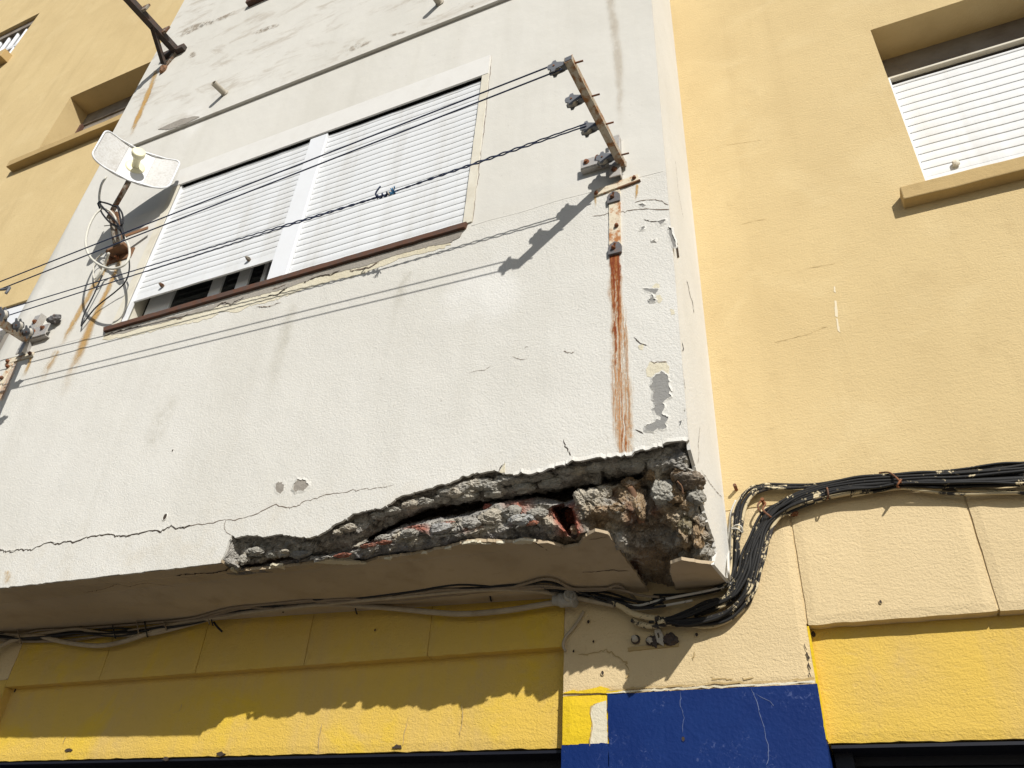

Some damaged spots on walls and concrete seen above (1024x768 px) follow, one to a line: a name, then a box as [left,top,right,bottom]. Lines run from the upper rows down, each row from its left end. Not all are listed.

corrosion [66,258,120,359]
flaking render [102,230,463,340]
corrosion [610,254,632,452]
spalling [638,217,679,258]
crack [0,485,391,553]
spalling [223,361,716,587]